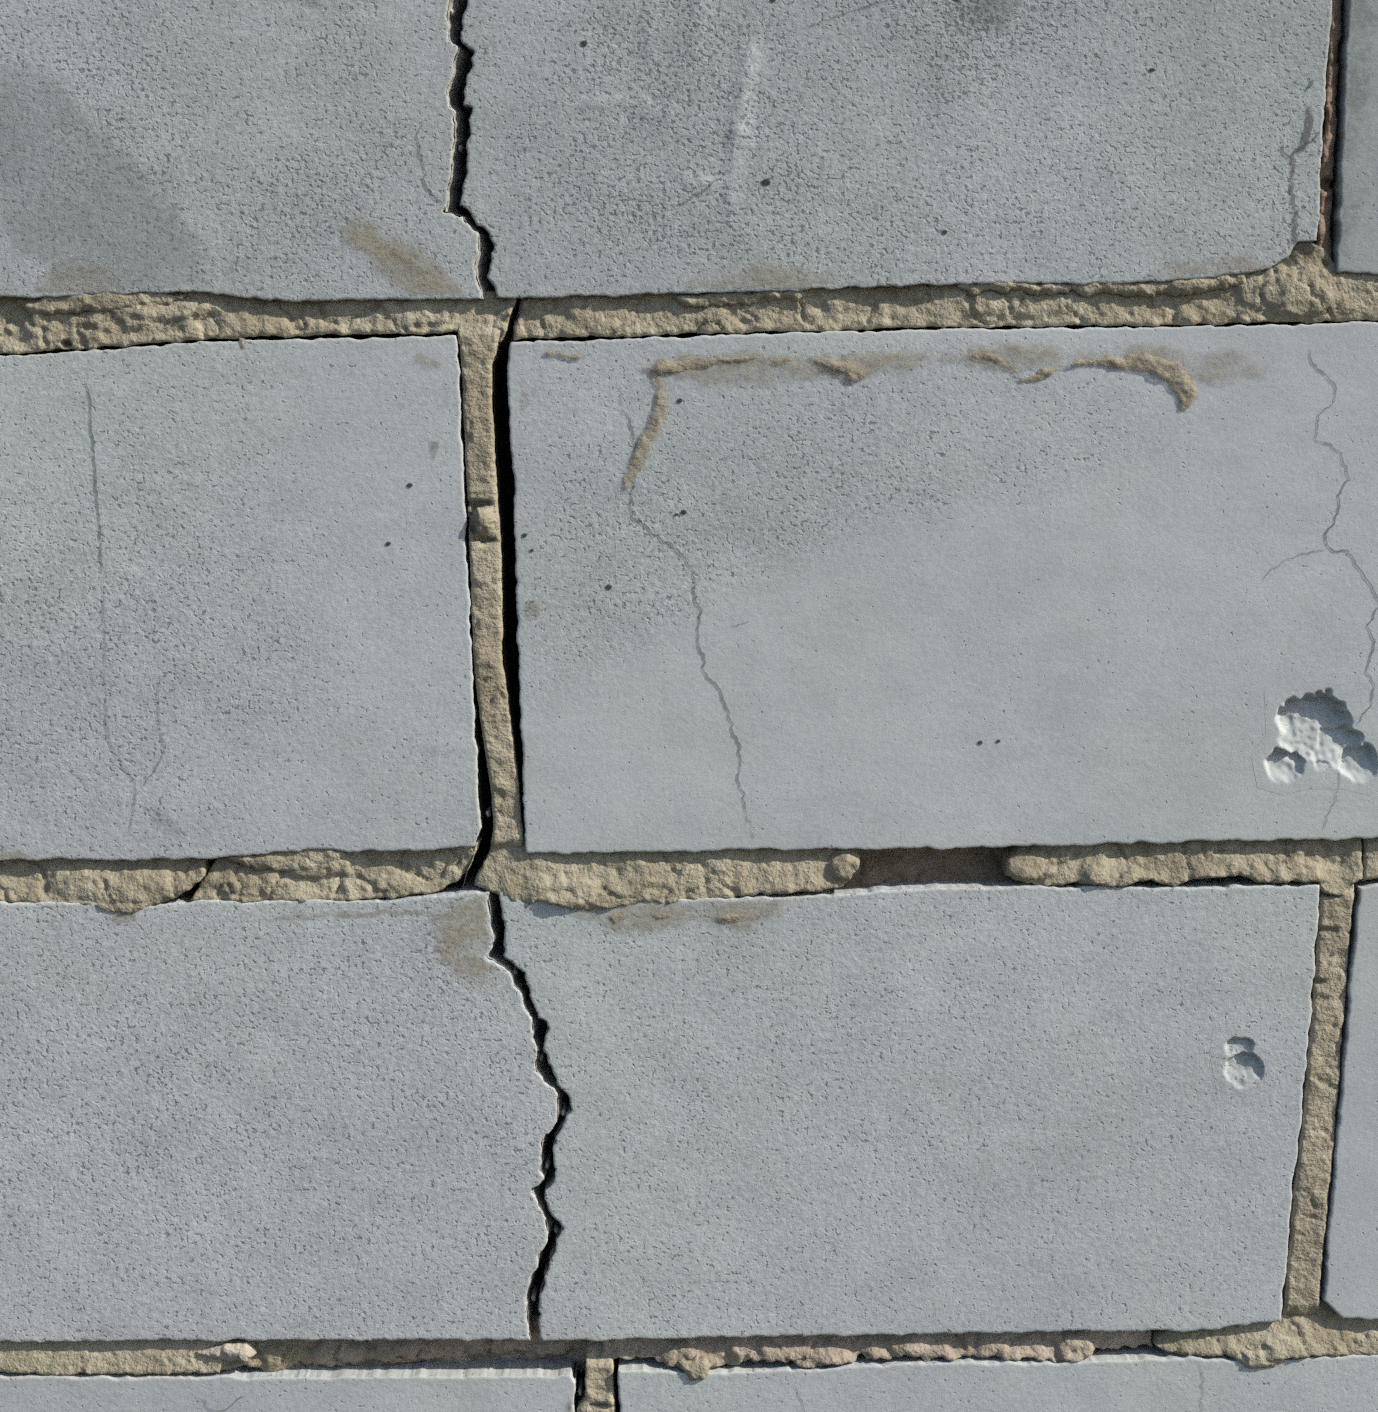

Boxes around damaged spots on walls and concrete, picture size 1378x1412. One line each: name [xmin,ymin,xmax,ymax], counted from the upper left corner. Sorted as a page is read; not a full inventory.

crack [416,0,571,1338]
crack [619,395,636,449]
crack [629,483,754,838]
crack [1309,353,1378,721]
crack [575,1367,586,1412]